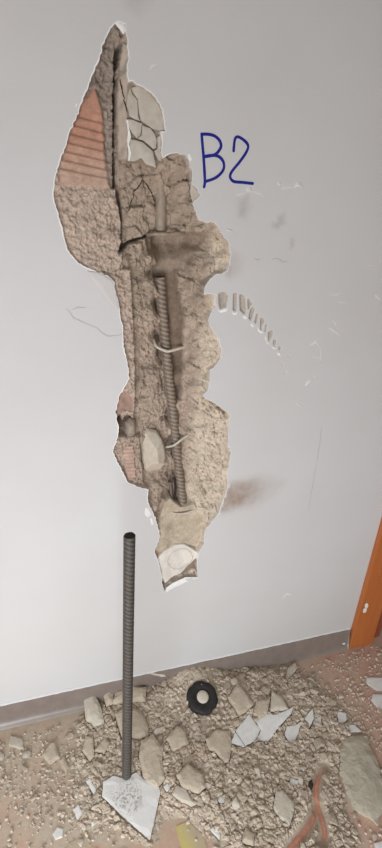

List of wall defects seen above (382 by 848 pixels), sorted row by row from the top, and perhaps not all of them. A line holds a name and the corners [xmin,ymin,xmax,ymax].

spalling [52,21,290,592]